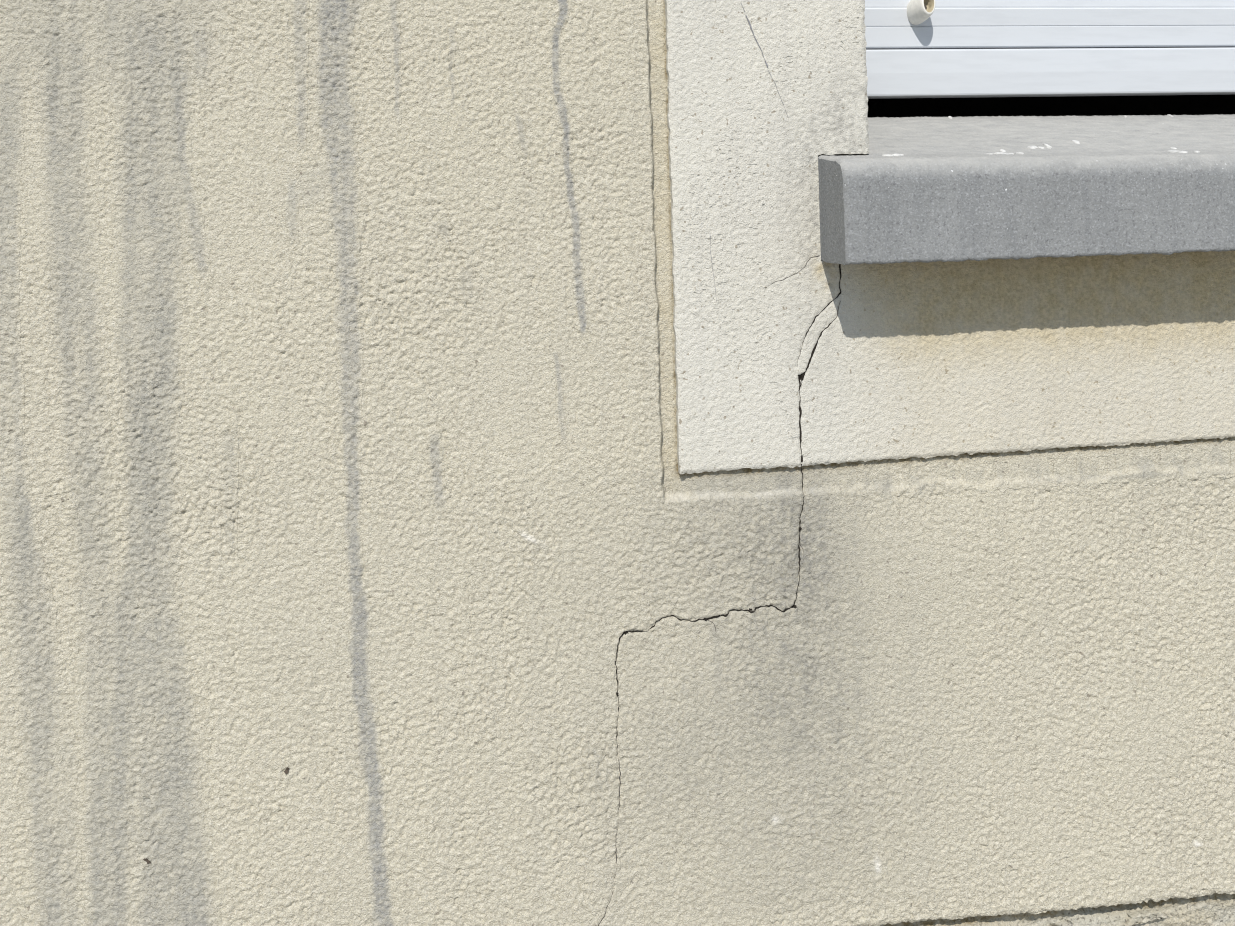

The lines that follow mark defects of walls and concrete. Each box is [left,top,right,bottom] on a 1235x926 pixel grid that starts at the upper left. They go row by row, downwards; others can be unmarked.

water stain [0,0,241,926]
water stain [284,0,398,926]
water stain [550,0,589,337]
crack [598,255,841,926]